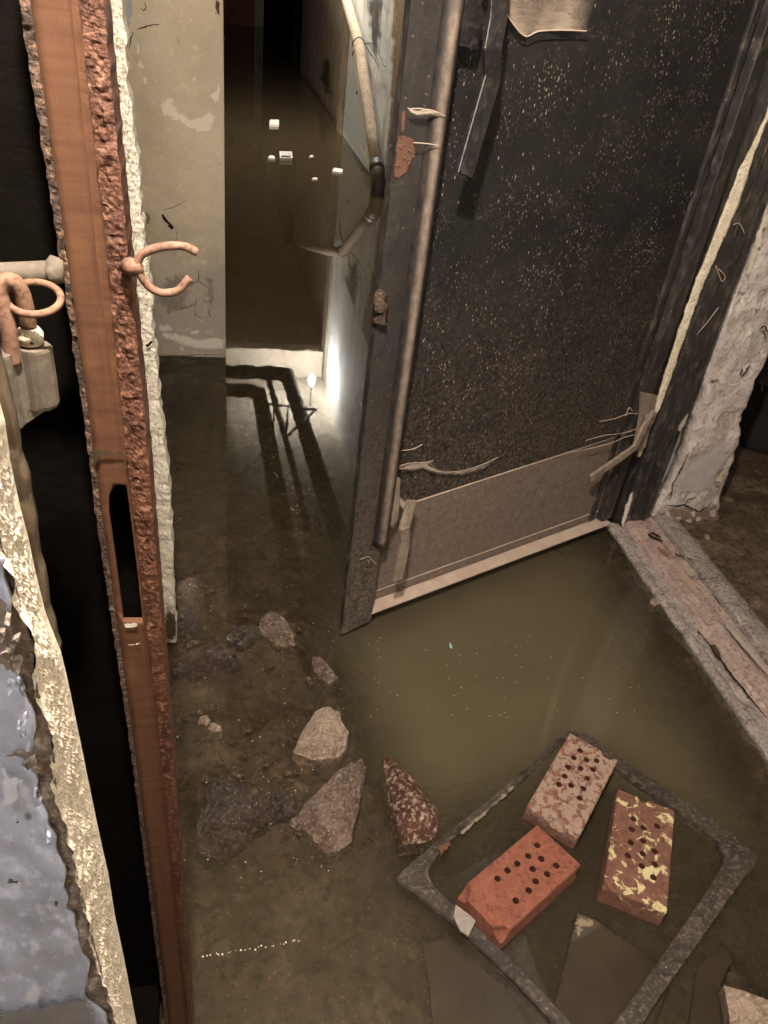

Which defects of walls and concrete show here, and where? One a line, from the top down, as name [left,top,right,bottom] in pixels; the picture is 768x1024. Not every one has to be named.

corrosion [393,110,416,180]
spalling [738,205,768,301]
peeling [680,438,733,493]
spalling [660,504,719,522]
spalling [0,599,42,811]
spalling [0,984,95,1024]